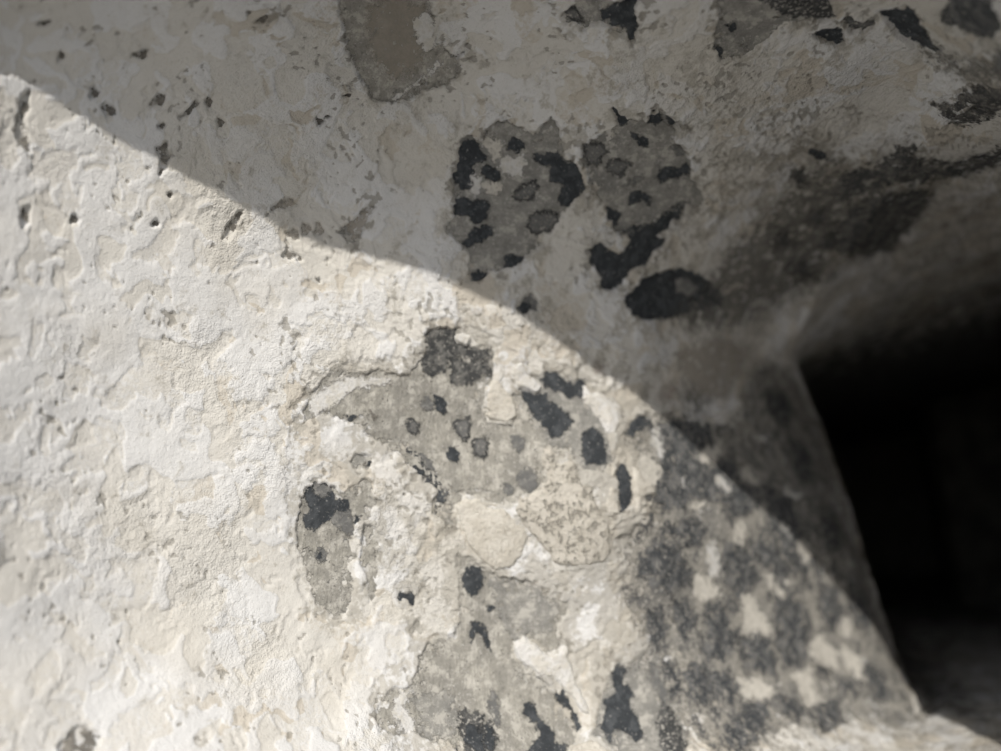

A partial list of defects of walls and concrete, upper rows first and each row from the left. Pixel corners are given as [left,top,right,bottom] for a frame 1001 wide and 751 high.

peeling [339,0,460,102]
peeling [296,327,937,751]